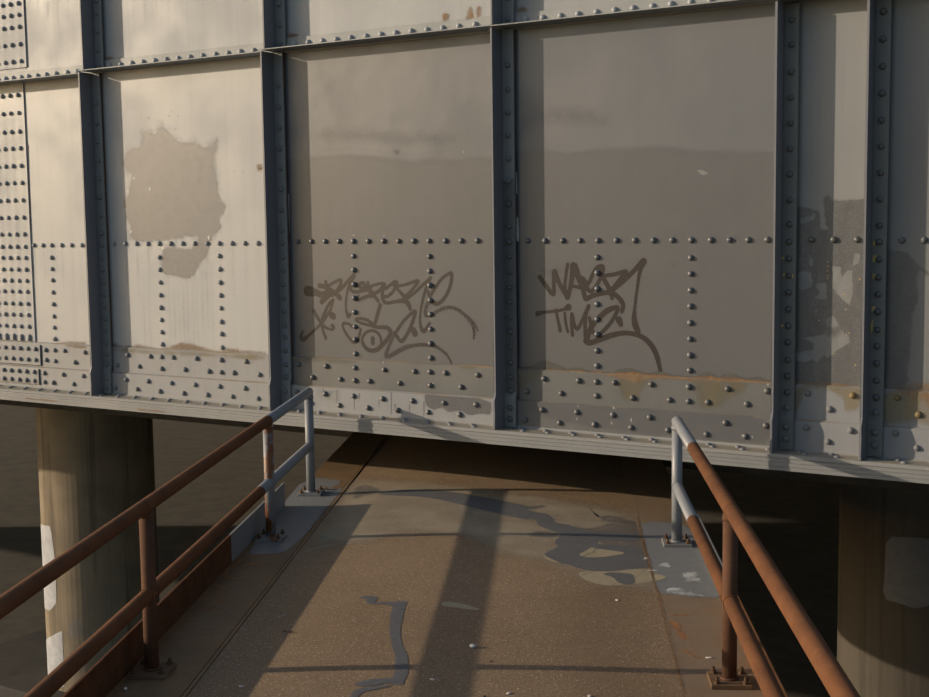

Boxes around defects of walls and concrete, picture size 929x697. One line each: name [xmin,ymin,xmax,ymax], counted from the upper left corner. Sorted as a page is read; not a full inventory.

peeling [783,254,860,310]
rust [112,342,266,360]
peeling [796,310,850,363]